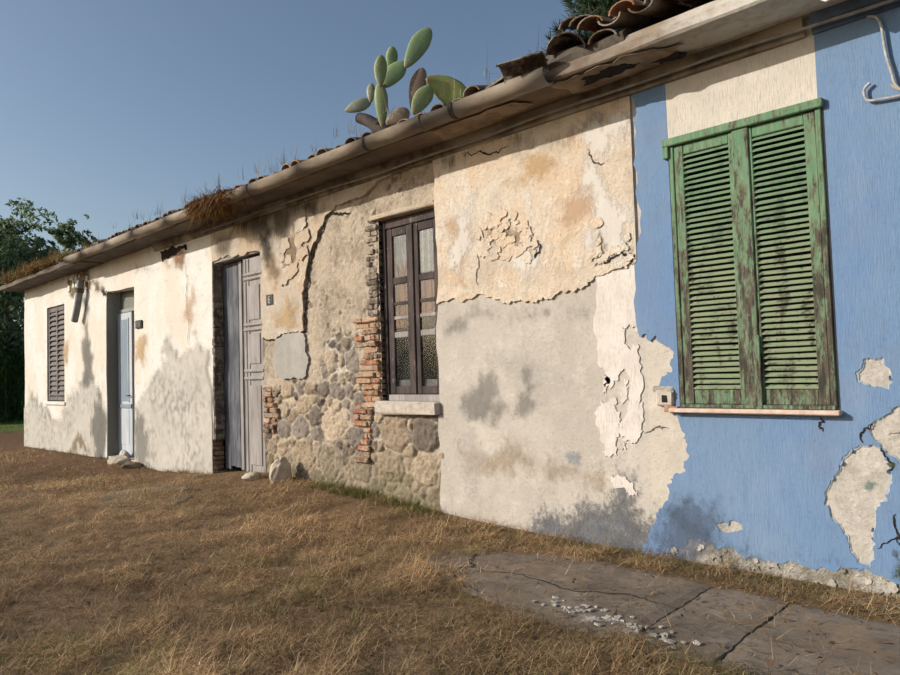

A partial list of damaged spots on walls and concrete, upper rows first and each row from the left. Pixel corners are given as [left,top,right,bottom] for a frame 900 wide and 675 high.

crack [465,146,508,156]
damp [24,271,105,458]
damp [134,339,212,474]
peeling [210,174,393,340]
crack [264,211,351,341]
damp [462,376,502,421]
damp [517,371,541,412]
peeling [432,7,900,595]
damp [531,469,719,561]
crack [878,514,900,549]